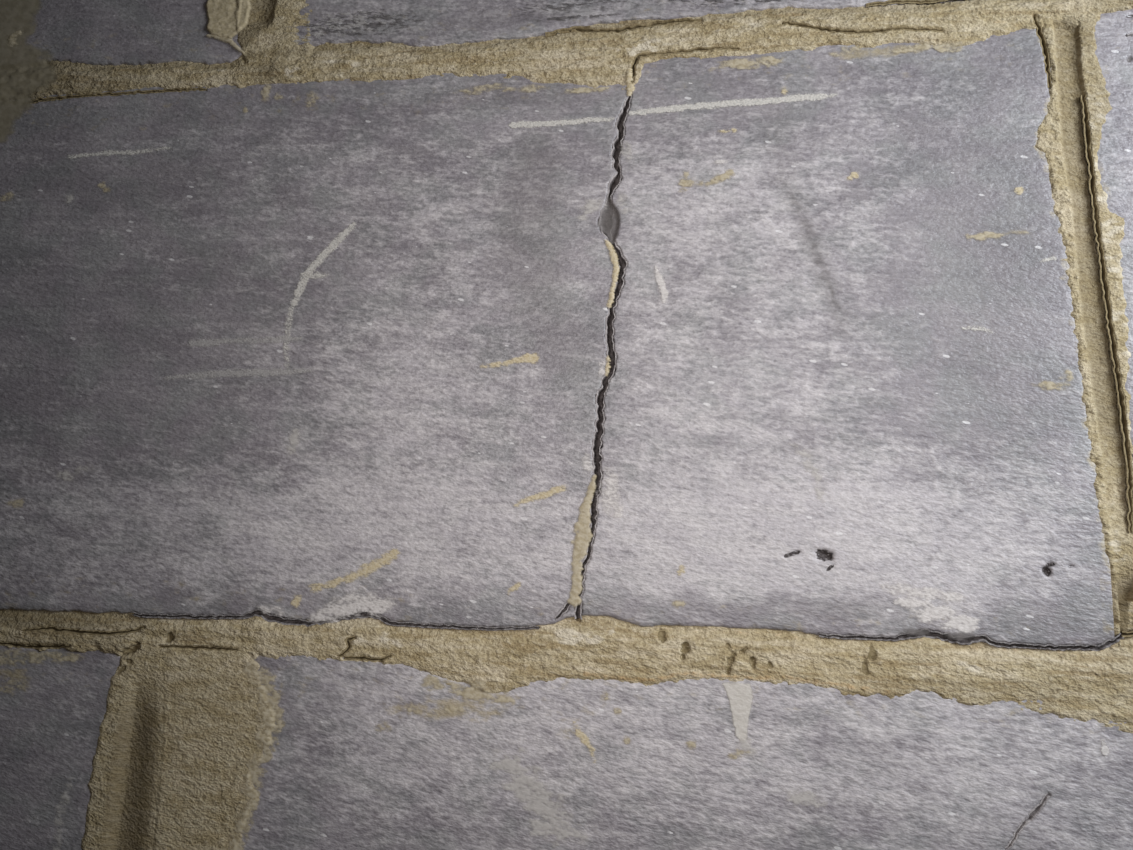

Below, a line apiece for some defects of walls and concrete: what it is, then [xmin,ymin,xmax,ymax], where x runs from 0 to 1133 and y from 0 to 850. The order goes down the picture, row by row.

crack [554,46,739,620]